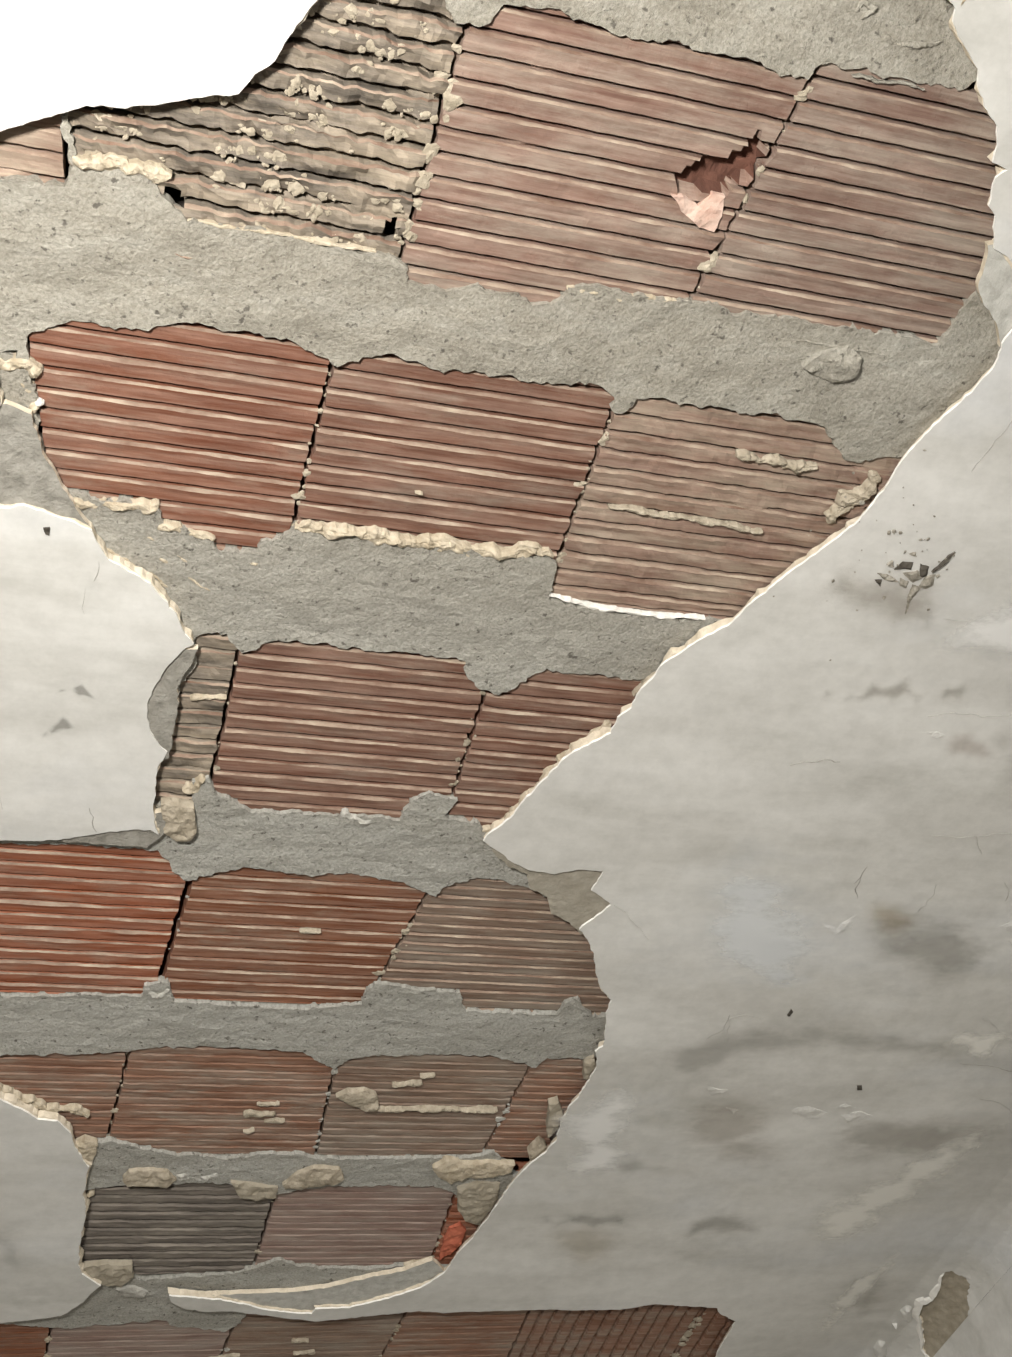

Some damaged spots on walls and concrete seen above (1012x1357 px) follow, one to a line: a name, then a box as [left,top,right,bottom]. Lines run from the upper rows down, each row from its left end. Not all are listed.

spalling [384,126,409,141]
spalling [210,170,226,183]
spalling [261,179,282,192]
spalling [273,196,299,215]
spalling [285,181,306,196]
spalling [306,203,323,223]
peeling [0,399,90,526]
peeling [147,644,198,760]
peeling [61,808,166,848]
peeling [491,847,610,934]
peeling [218,1256,444,1310]
spalling [382,1304,734,1357]